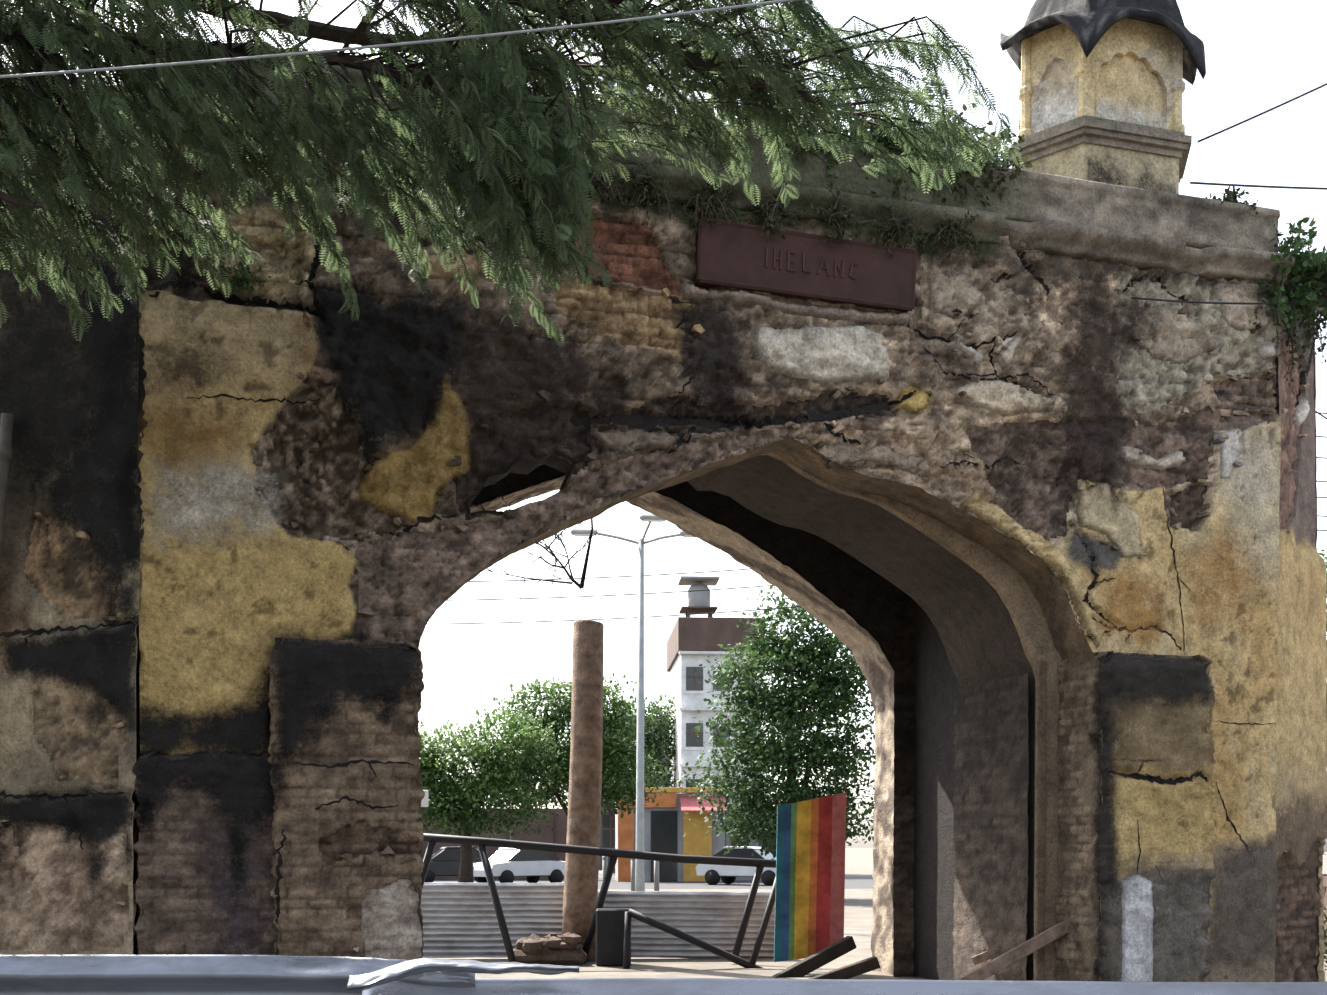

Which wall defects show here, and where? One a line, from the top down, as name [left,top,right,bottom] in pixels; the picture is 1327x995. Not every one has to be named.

flaking render [404,245,488,281]
crack [136,229,332,543]
spalling [252,253,1310,649]
water stain [918,240,1316,509]
crack [0,621,134,643]
water stain [0,160,498,955]
crack [1077,486,1190,654]
crack [0,790,125,850]
spalling [318,822,419,865]
spalling [353,879,423,961]
water stain [1087,651,1215,982]
crack [1110,758,1249,852]